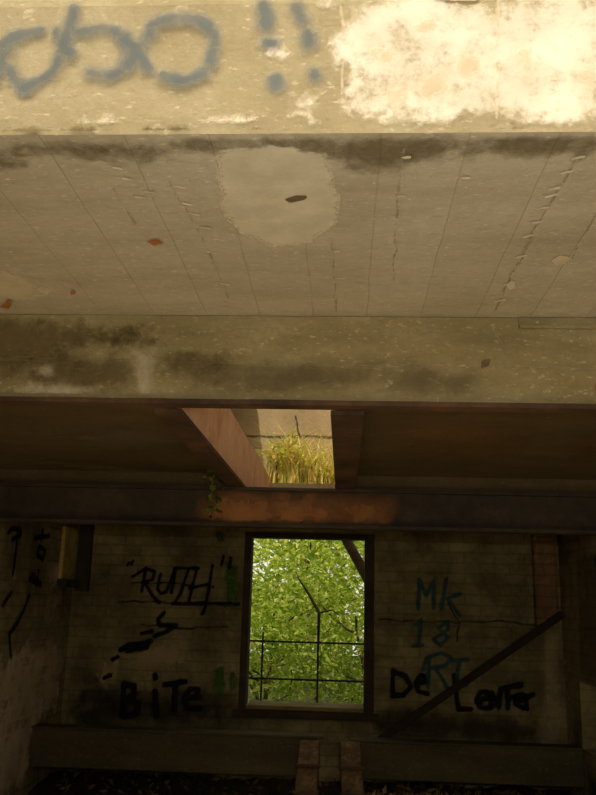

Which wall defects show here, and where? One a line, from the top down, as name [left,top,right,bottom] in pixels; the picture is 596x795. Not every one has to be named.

peeling [267,40,288,58]
peeling [328,0,596,123]
leakage [301,139,446,167]
leakage [495,138,596,154]
crack [494,156,586,310]
leakage [0,321,123,386]
rust [207,492,387,524]